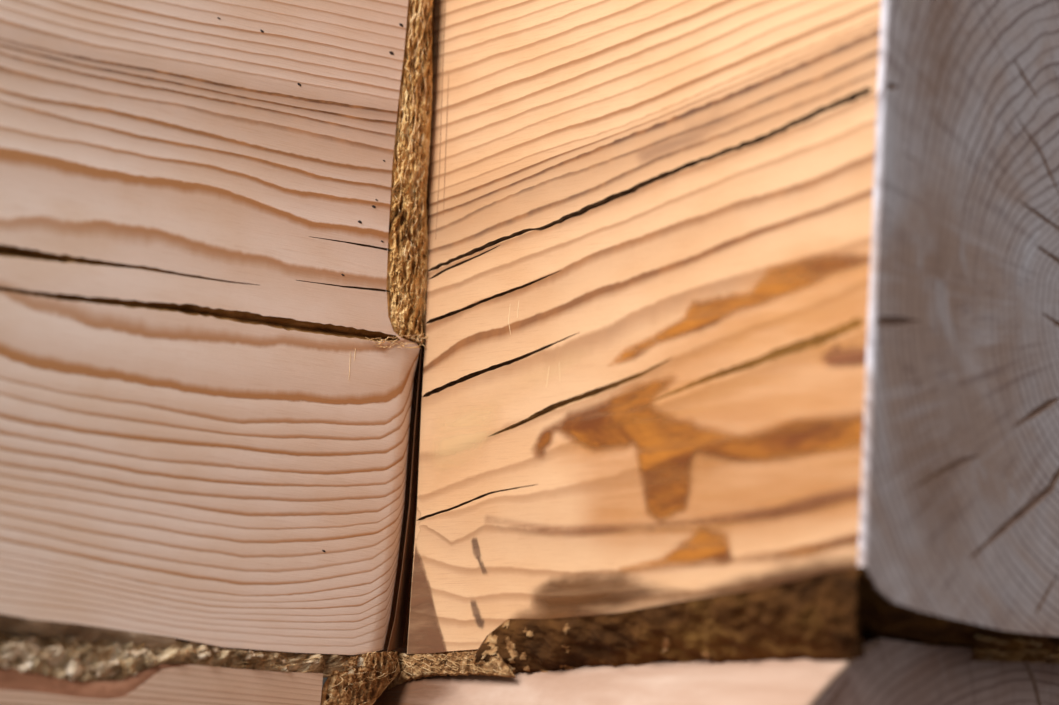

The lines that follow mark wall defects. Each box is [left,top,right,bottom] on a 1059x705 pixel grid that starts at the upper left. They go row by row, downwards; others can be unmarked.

crack [428,83,899,280]
crack [0,245,257,285]
crack [0,287,400,342]
crack [297,280,390,292]
crack [309,236,390,251]
crack [426,270,561,324]
crack [1019,200,1059,263]
crack [422,332,580,397]
crack [653,316,921,401]
crack [488,358,672,437]
crack [1014,397,1059,427]
crack [969,468,1059,559]